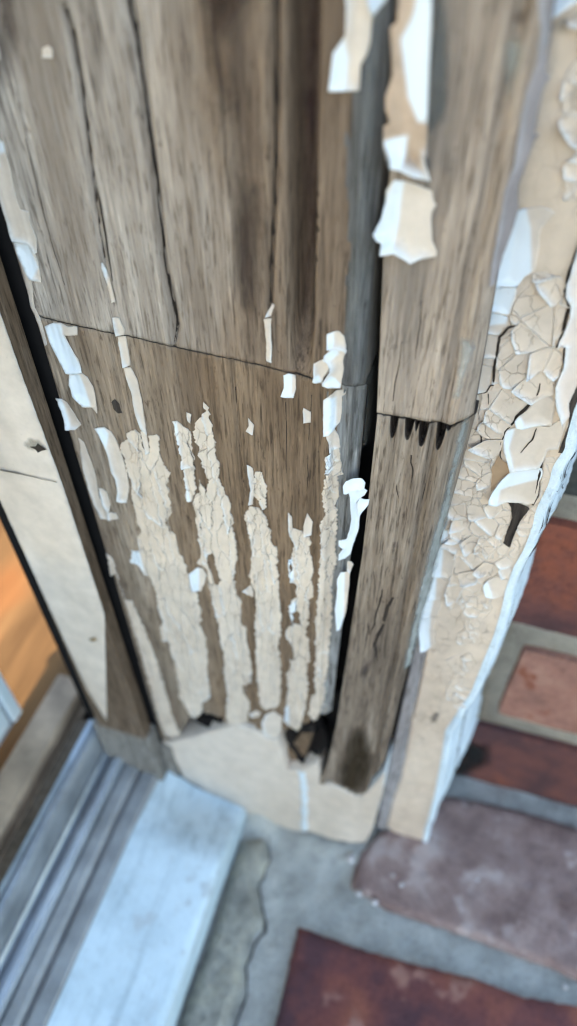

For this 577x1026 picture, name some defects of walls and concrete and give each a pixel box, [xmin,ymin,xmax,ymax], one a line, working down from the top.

crack [25,139,65,285]
crack [65,8,113,281]
crack [127,0,180,342]
peeling [328,0,437,264]
peeling [0,140,369,738]
peeling [418,0,577,710]
crack [235,837,271,1026]